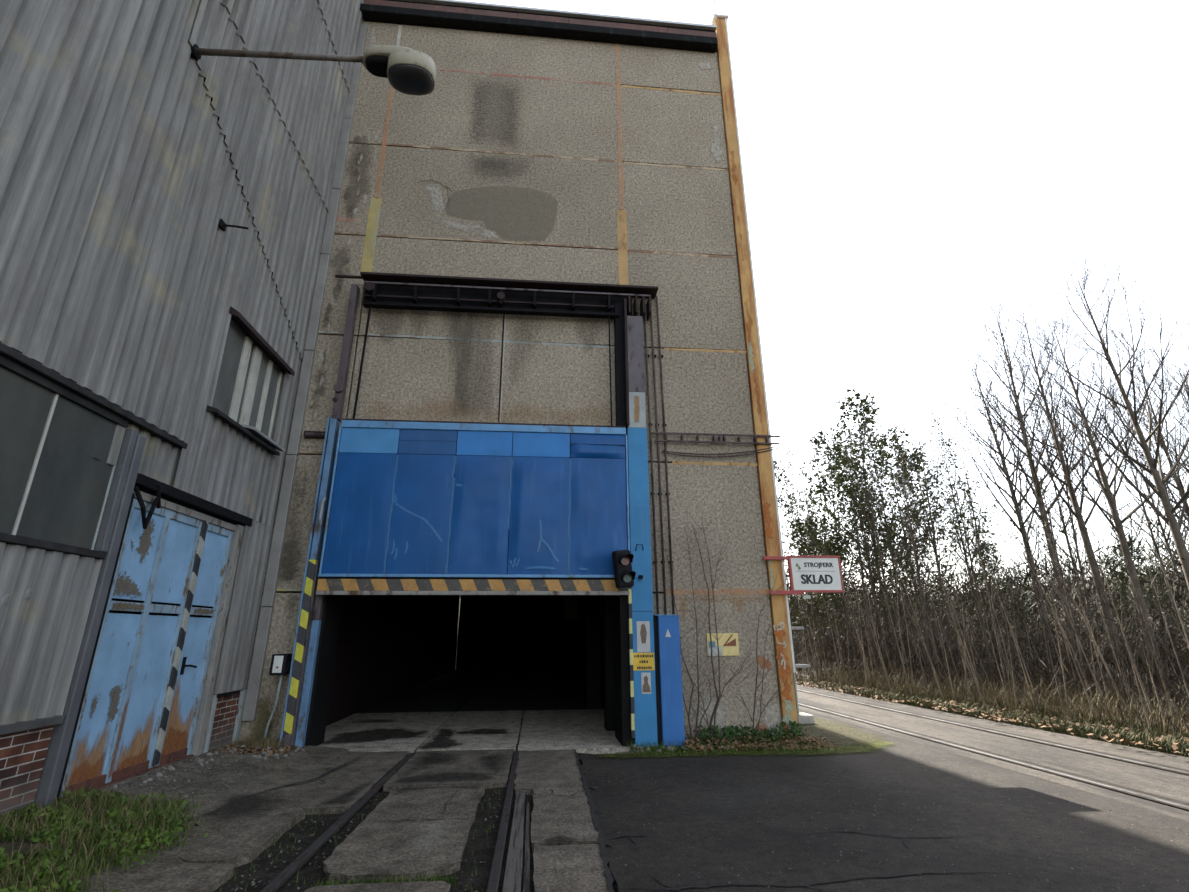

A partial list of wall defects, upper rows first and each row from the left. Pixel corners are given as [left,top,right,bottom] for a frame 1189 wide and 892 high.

spalling [425,184,498,240]
corrosion [67,687,192,786]